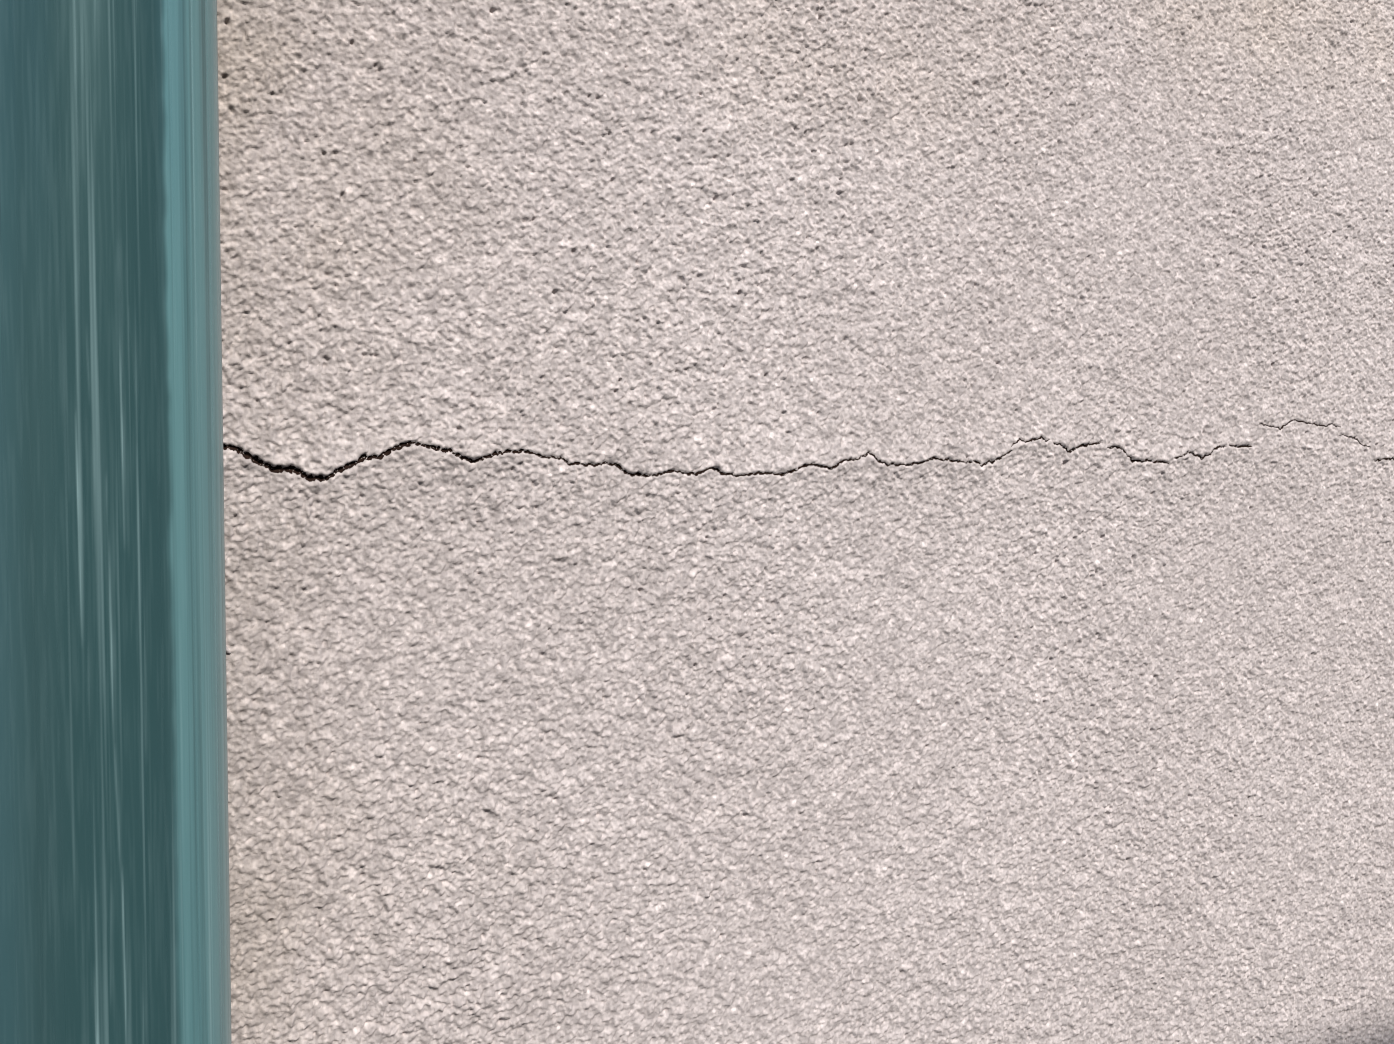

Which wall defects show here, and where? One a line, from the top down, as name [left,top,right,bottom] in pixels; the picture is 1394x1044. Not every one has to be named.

crack [223,419,1394,482]